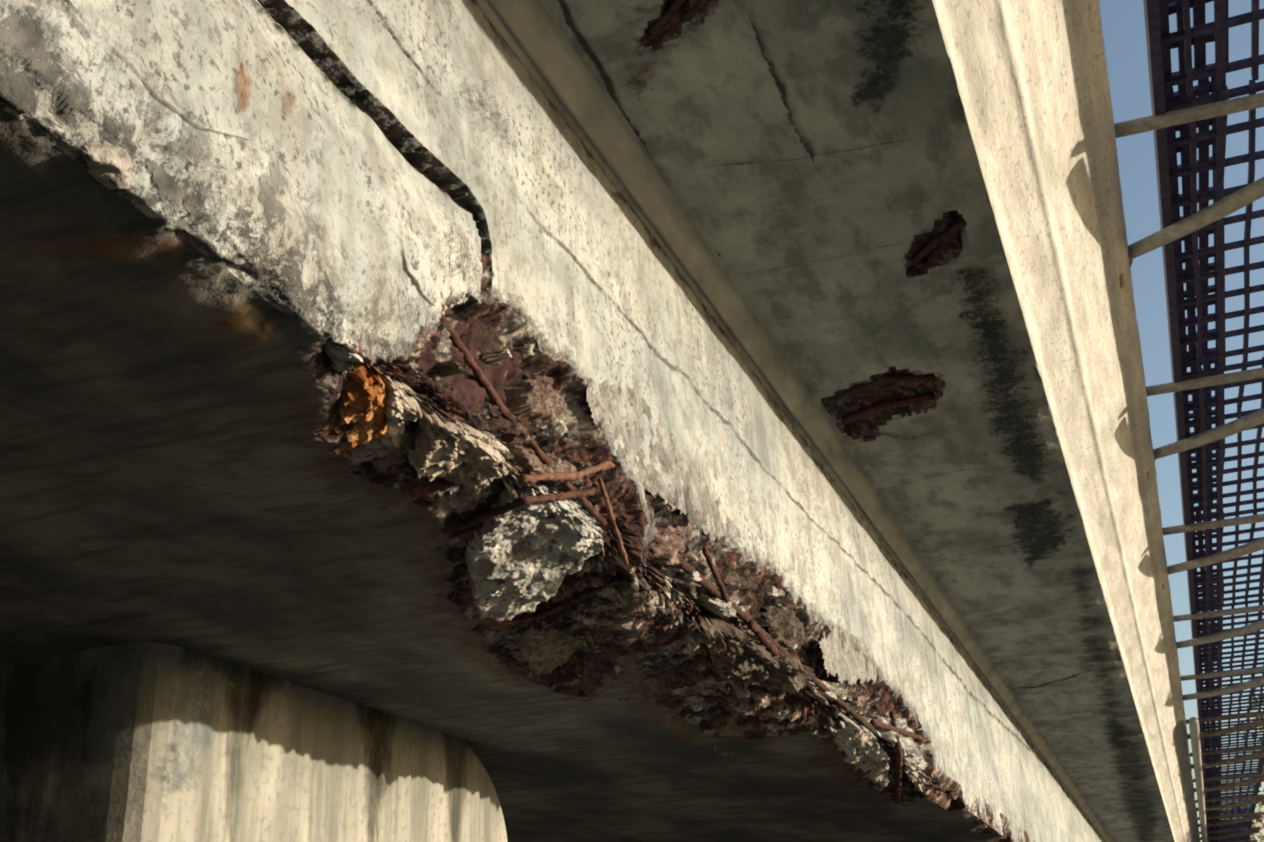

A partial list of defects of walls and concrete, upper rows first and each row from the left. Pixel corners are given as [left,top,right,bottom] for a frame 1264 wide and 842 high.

peeling [0,0,95,151]
crack [124,57,249,140]
crack [253,0,493,306]
spalling [639,0,718,51]
water stain [851,0,922,113]
water stain [951,268,1050,483]
spalling [130,140,1035,842]
water stain [1001,498,1071,570]
water stain [167,647,283,796]
water stain [356,703,395,842]
water stain [444,733,482,842]